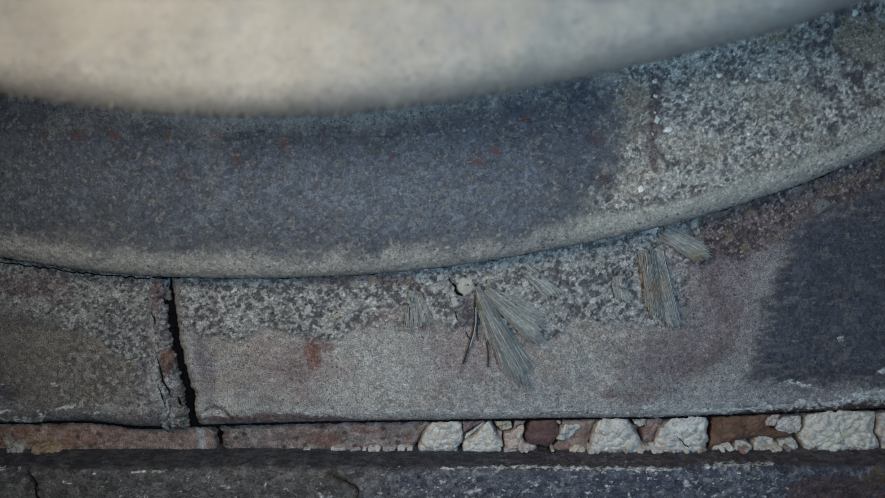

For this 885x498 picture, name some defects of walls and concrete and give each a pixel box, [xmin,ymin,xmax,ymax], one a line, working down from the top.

crack [0,258,885,448]